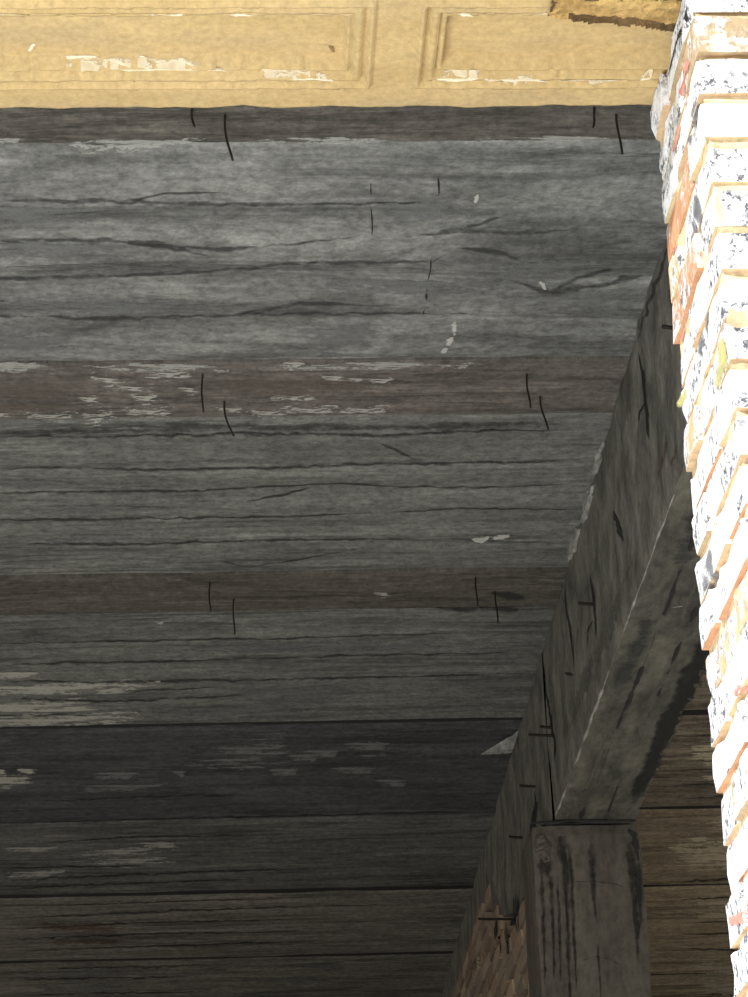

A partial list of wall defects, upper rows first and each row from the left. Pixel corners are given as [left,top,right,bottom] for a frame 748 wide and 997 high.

spalling [539,0,682,32]
peeling [59,55,225,72]
peeling [262,69,334,82]
peeling [437,70,546,86]
crack [424,218,528,259]
crack [0,238,437,321]
crack [524,249,671,439]